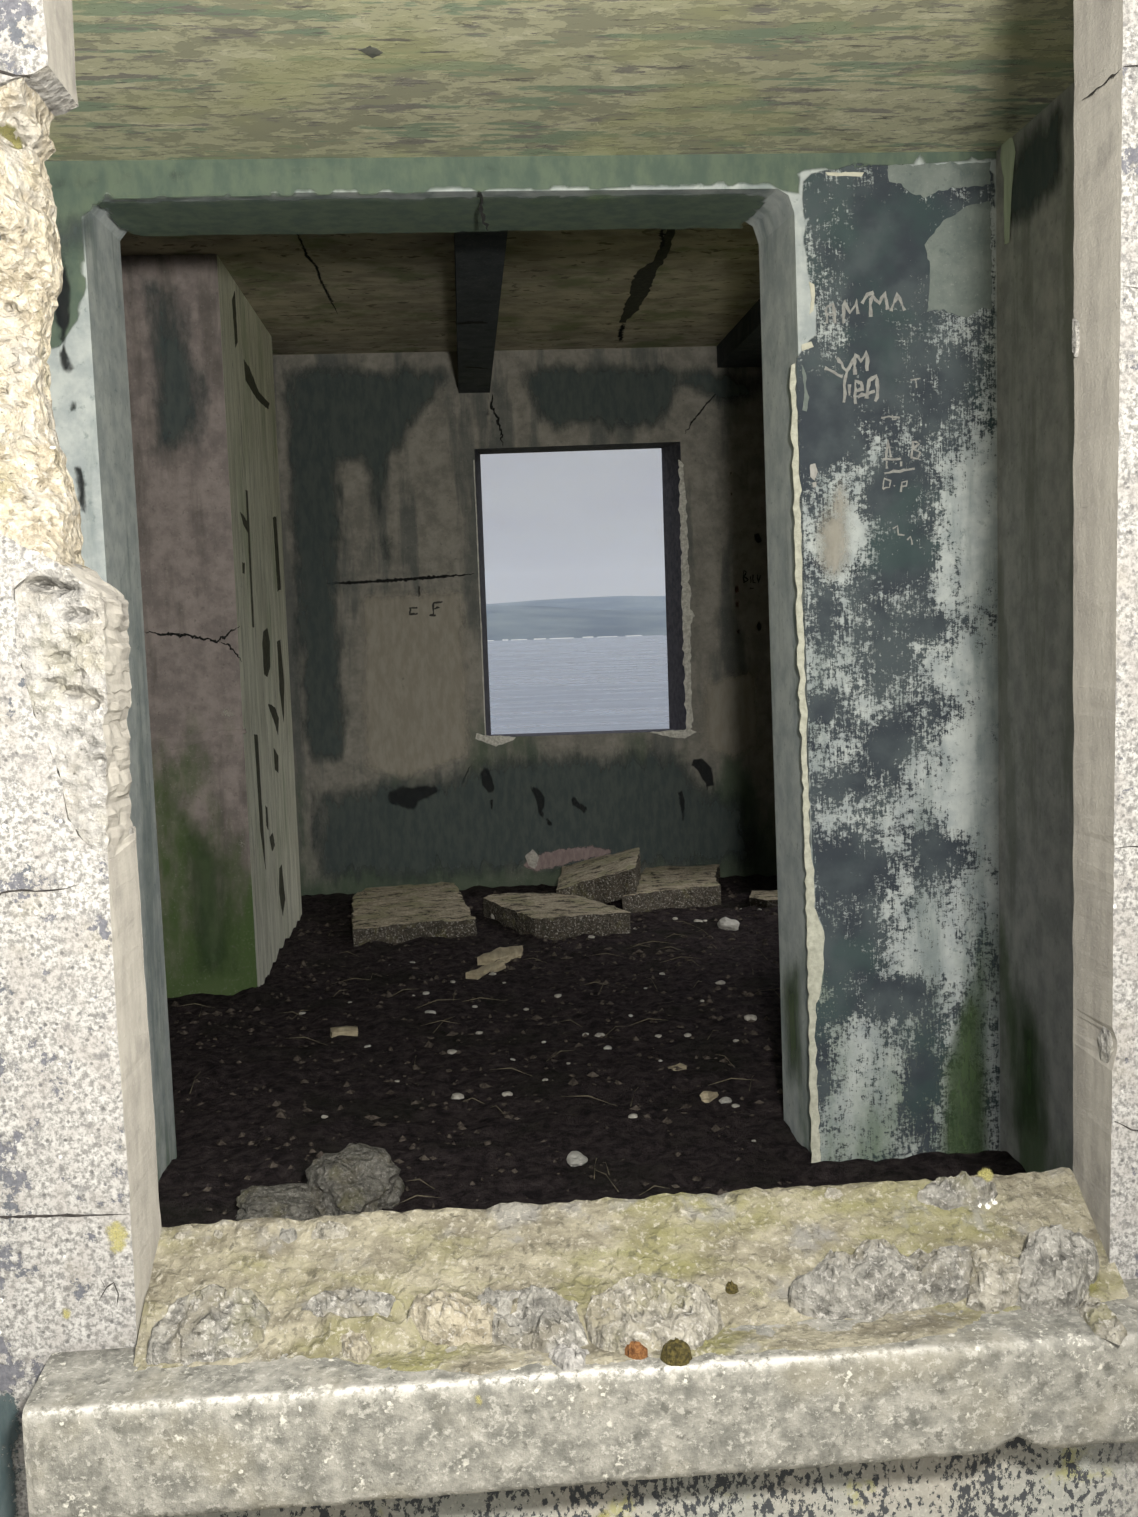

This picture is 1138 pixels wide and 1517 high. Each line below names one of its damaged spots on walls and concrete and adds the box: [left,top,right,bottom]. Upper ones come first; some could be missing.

crack [0,69,31,77]
crack [1084,65,1138,99]
crack [297,234,338,314]
peeling [232,291,270,409]
water stain [527,364,758,431]
spalling [0,78,133,861]
crack [147,627,242,662]
peeling [240,490,285,915]